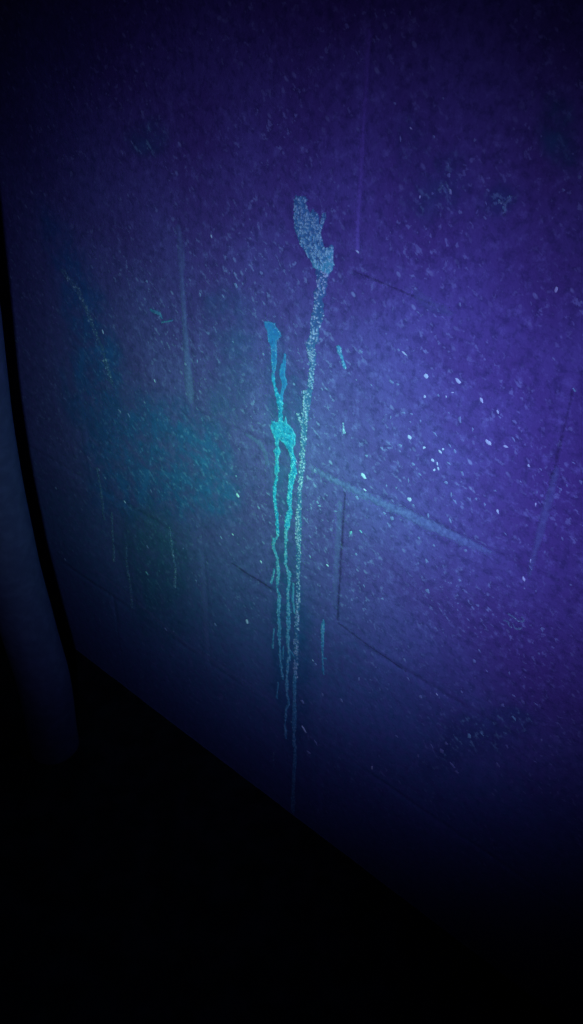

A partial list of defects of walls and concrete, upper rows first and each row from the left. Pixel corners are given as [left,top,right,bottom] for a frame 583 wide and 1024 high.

water stain [264,196,334,814]